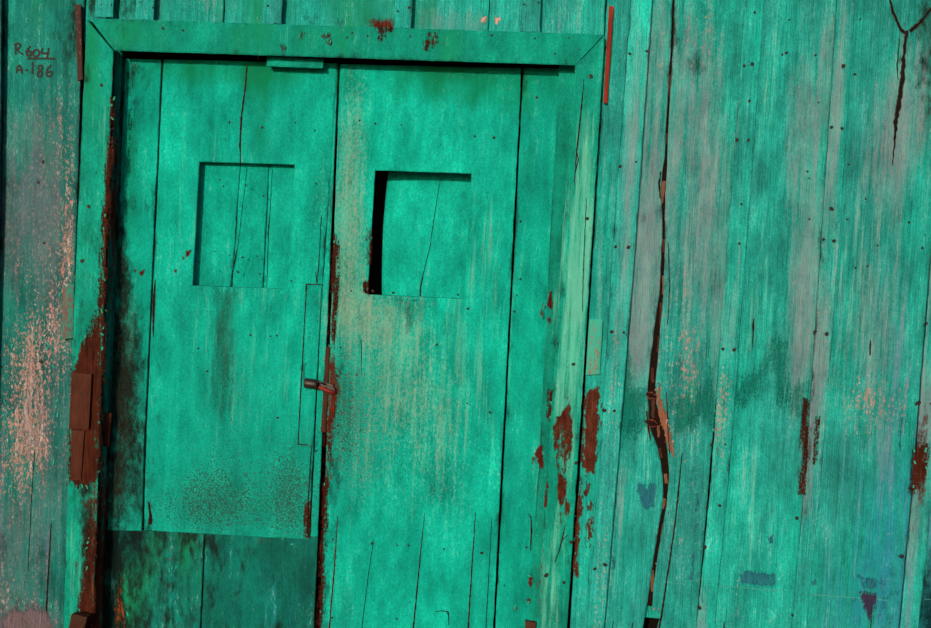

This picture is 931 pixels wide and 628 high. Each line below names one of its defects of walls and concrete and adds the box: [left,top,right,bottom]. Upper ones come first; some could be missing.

corrosion [370,18,395,42]
crack [889,0,931,166]
crack [644,0,685,628]
peeling [11,341,58,459]
corrosion [326,360,340,439]